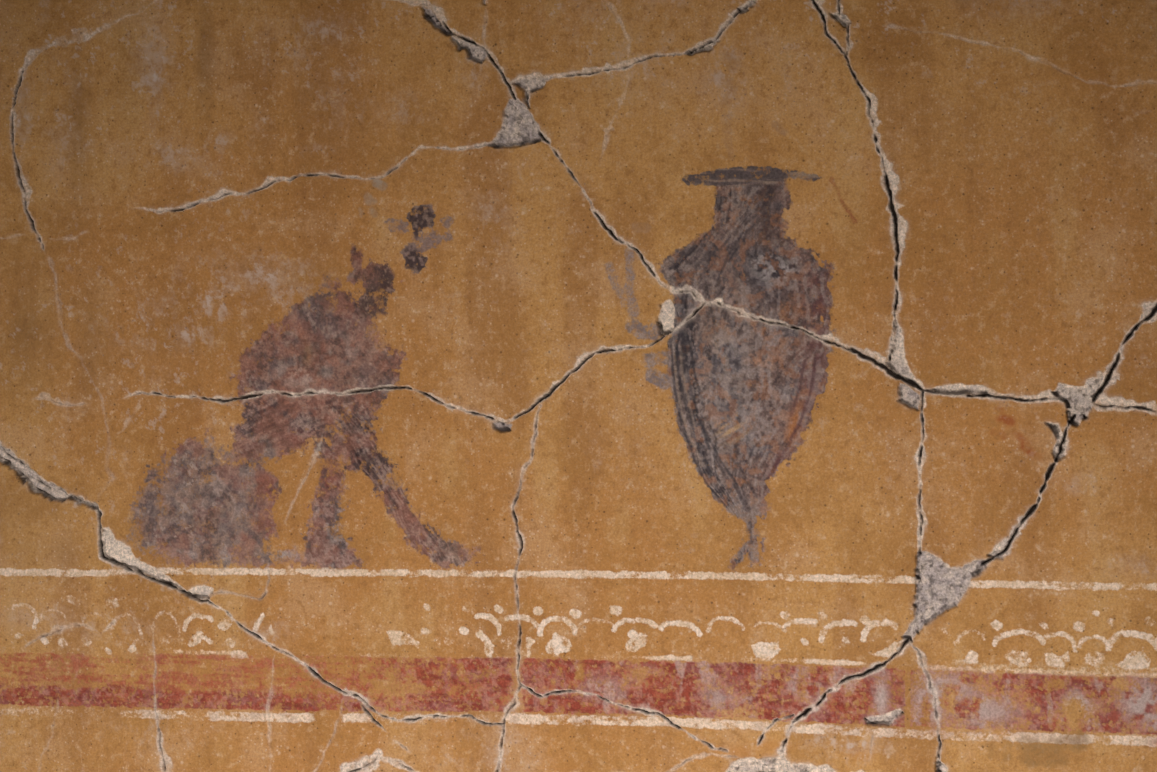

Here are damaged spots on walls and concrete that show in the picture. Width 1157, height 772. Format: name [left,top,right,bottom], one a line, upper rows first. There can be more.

crack [882,23,1157,89]
flaking render [487,76,549,149]
crack [0,0,909,772]
crack [1093,298,1157,417]
flaking render [0,440,100,510]
crack [912,378,1063,566]
flaking render [101,526,215,600]
flaking render [899,536,1011,643]
crack [755,639,944,761]
flaking render [724,754,868,772]